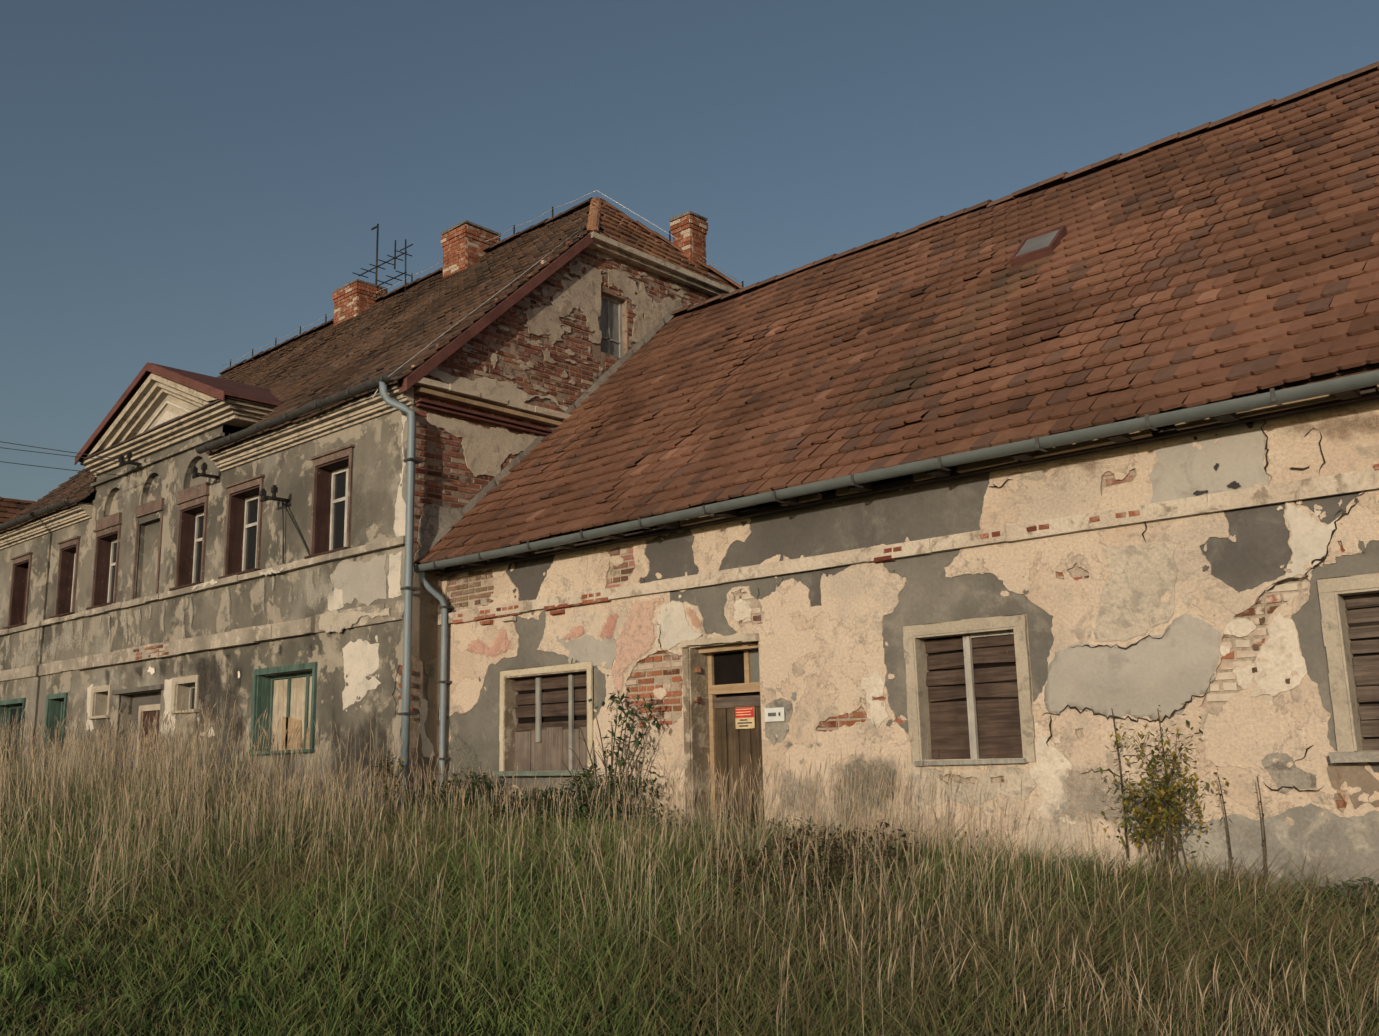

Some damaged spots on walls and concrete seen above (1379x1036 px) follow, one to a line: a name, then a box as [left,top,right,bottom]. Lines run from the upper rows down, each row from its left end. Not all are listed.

peeling [601,264,684,298]
peeling [453,313,603,399]
flaking render [342,472,1054,809]
flaking render [1200,491,1379,817]
flaking render [910,722,1076,824]